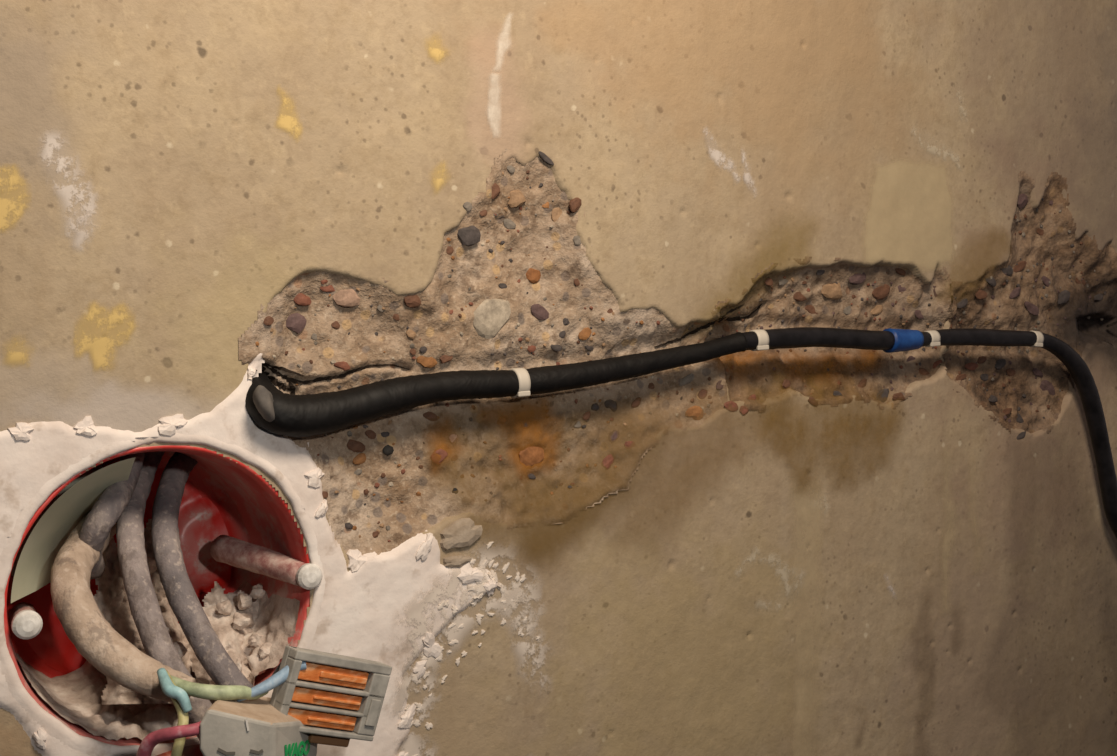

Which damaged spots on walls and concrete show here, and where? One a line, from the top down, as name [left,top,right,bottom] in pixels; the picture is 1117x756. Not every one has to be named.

spalling [238,149,1117,395]
crack [655,303,762,347]
crack [262,363,410,395]
rust [717,354,751,371]
rust [772,354,875,377]
spalling [288,345,1070,573]